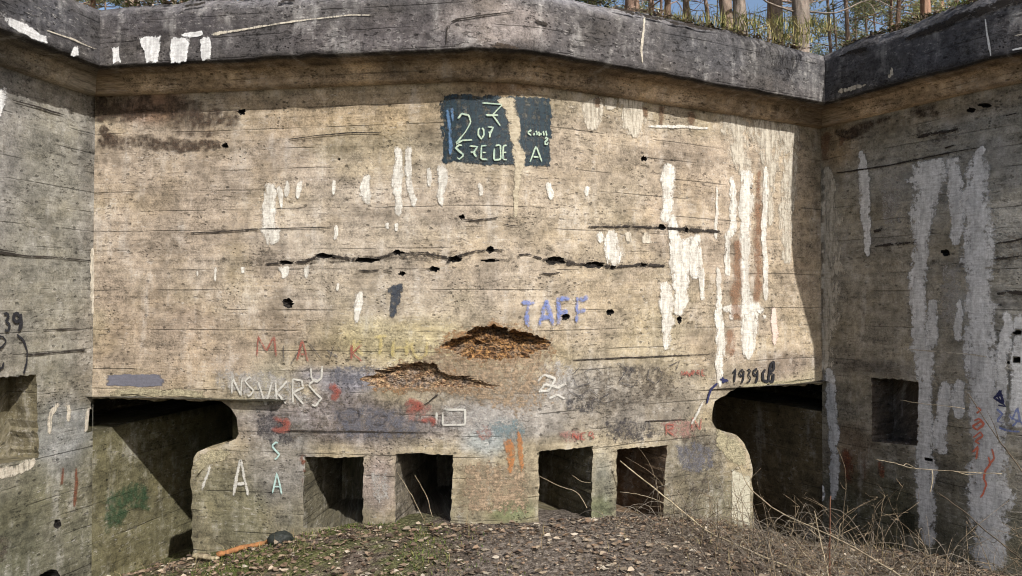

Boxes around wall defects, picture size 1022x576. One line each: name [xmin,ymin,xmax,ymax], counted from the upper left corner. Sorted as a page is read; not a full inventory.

damp [94,94,239,153]
crack [186,226,326,234]
crack [459,217,516,226]
crack [266,249,665,275]
spalling [214,323,750,527]